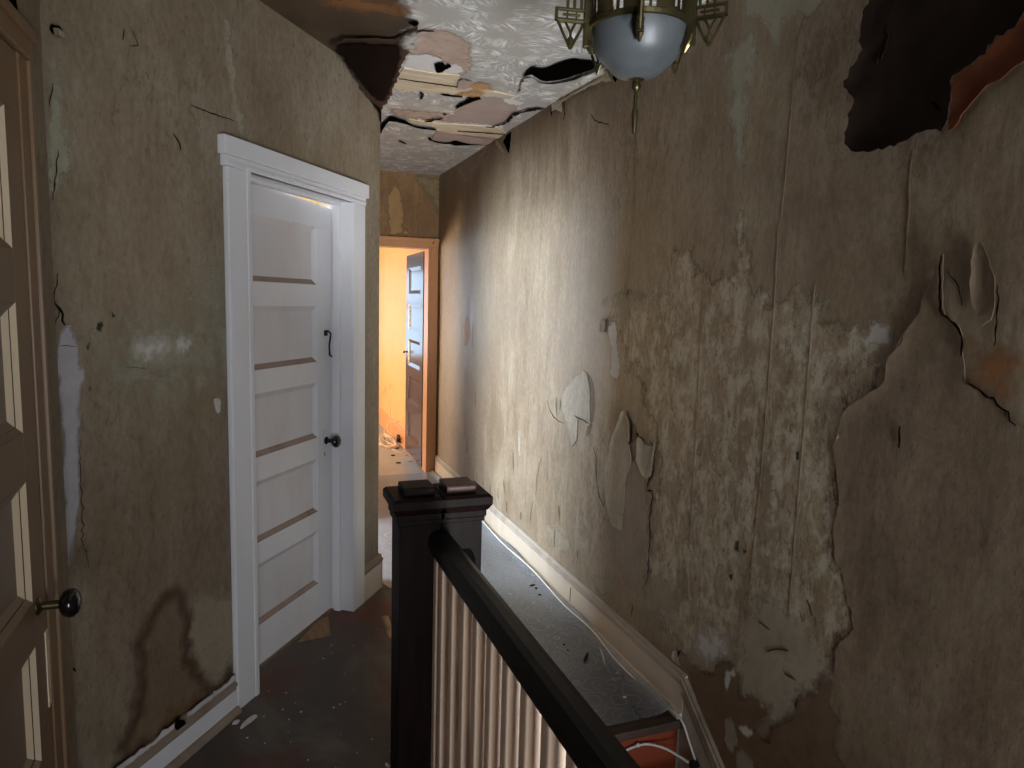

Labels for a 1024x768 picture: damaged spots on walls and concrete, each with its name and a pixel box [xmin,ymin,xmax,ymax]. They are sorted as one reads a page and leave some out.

peeling [451,97,525,126]
crack [54,274,65,326]
peeling [608,322,620,379]
peeling [861,323,891,349]
crack [992,285,1000,346]
flaking render [57,326,89,569]
leakage [120,590,232,764]